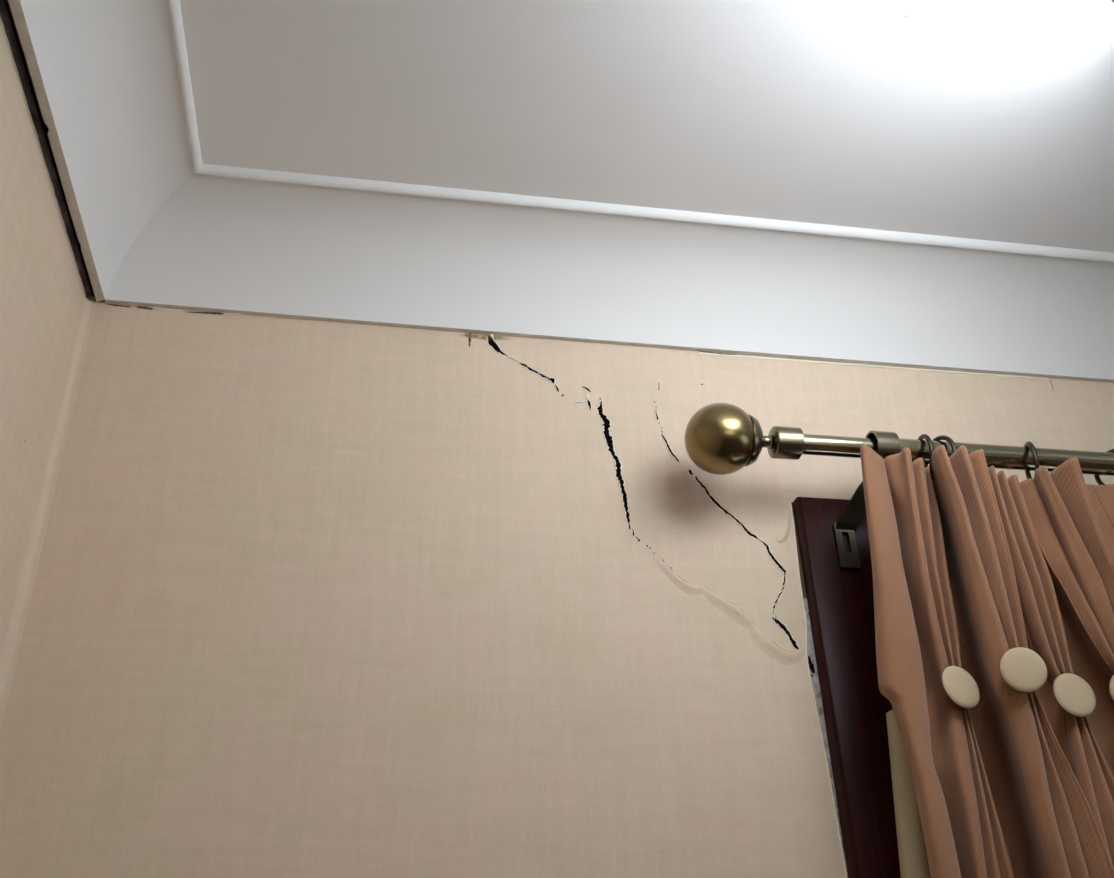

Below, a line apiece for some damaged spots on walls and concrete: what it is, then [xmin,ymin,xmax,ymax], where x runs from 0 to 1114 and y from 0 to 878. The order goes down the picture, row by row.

crack [486,334,672,569]
crack [654,389,799,650]